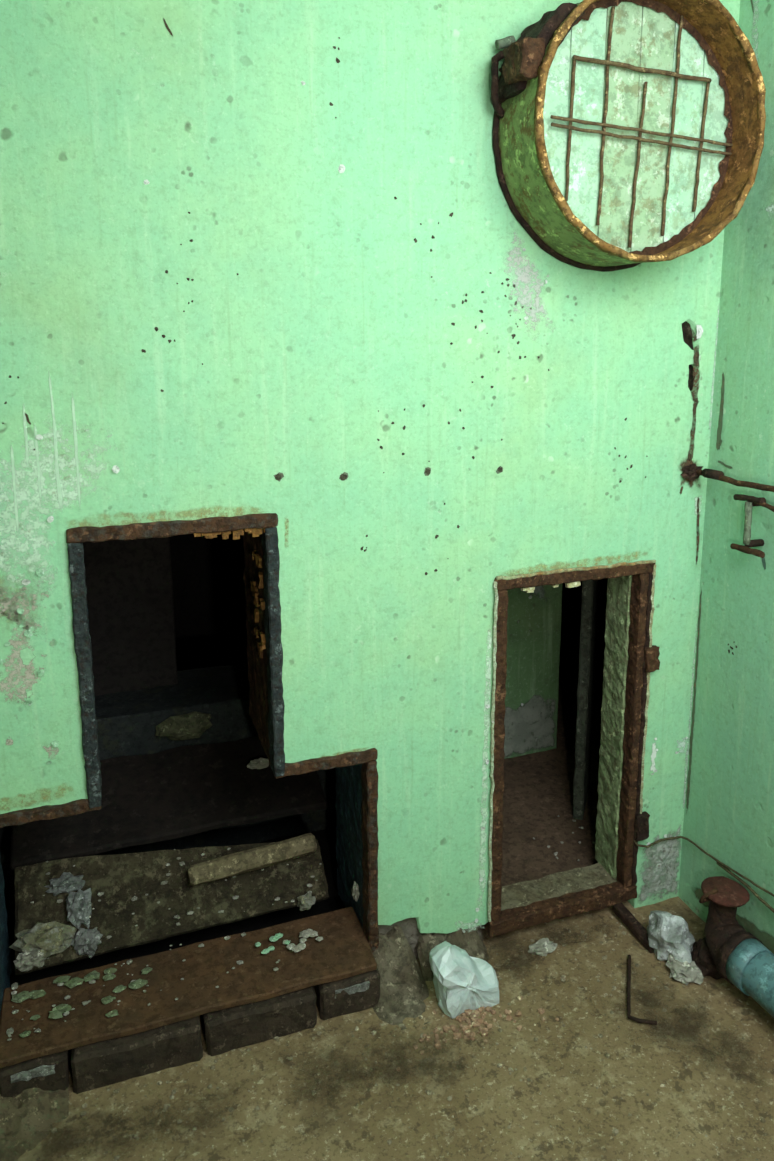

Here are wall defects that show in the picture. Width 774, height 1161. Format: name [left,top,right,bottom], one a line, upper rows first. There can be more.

corrosion [680,459,700,487]
corrosion [79,508,255,527]
peeling [0,428,120,706]